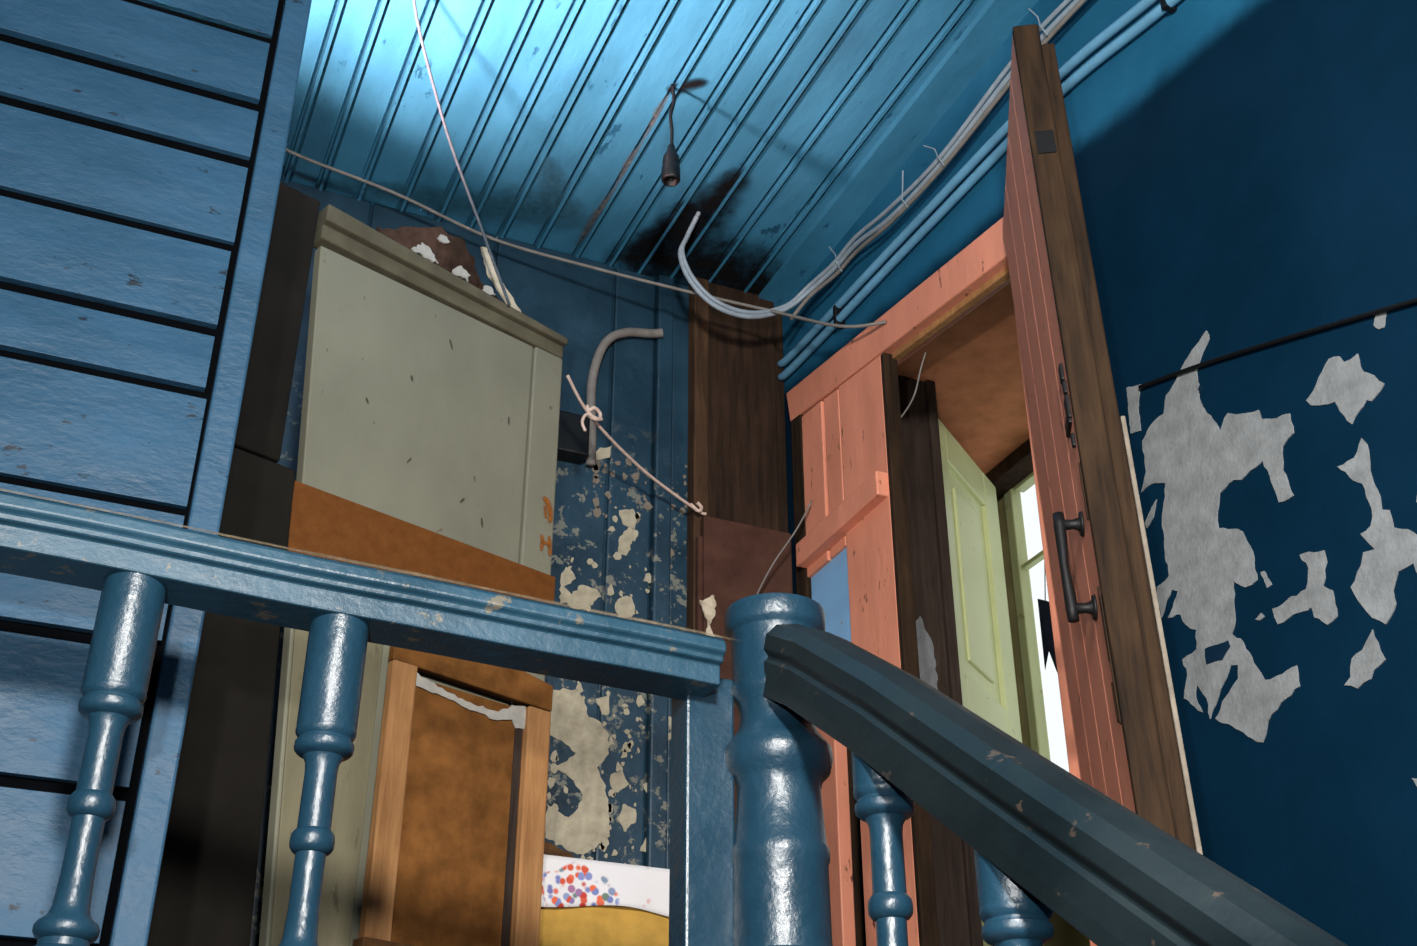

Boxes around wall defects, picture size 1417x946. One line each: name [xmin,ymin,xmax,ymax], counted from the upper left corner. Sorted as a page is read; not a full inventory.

peeling [1373,312,1387,330]
peeling [559,446,653,618]
peeling [671,465,688,514]
peeling [1126,330,1300,742]
peeling [1255,550,1338,625]
peeling [1306,354,1417,689]
peeling [545,681,647,864]